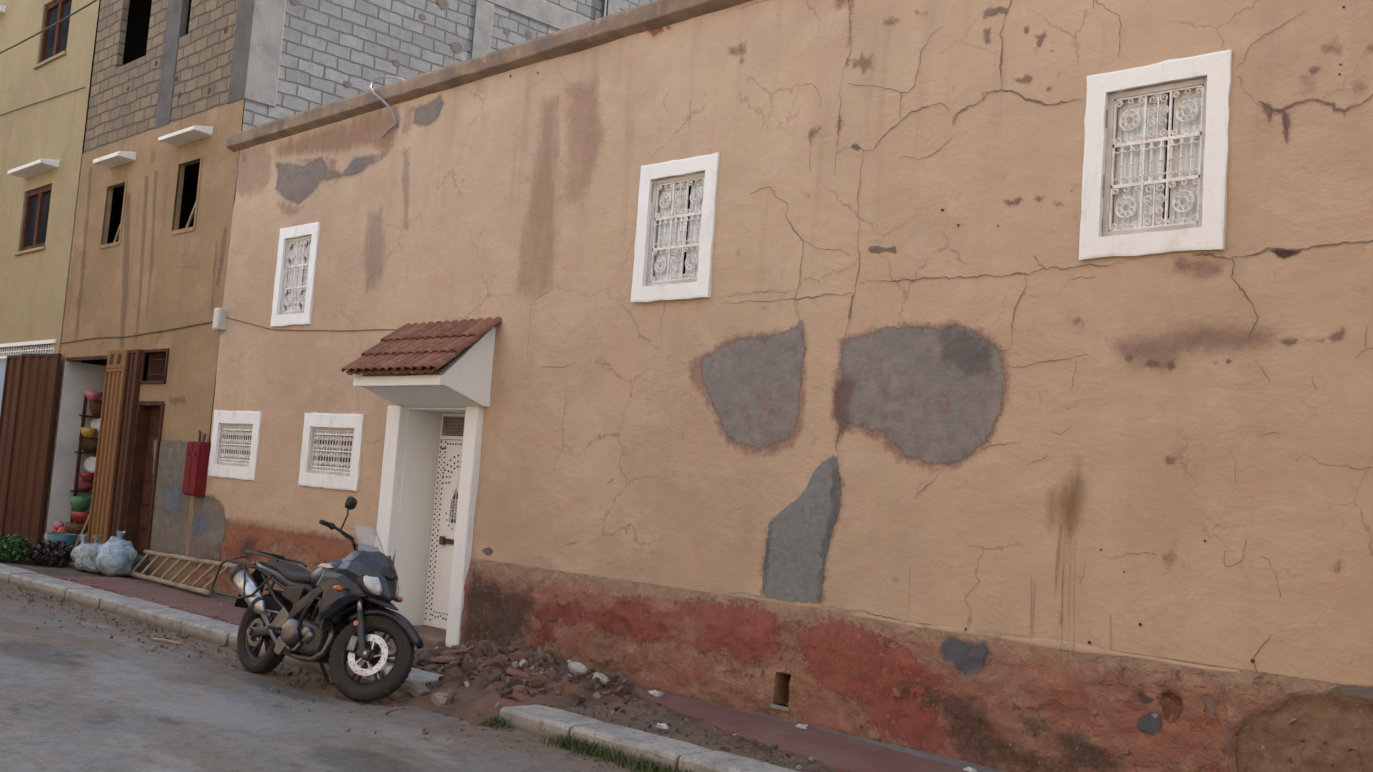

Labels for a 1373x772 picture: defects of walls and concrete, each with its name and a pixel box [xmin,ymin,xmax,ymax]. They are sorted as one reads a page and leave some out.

peeling [413,96,443,125]
crack [805,1,1082,214]
crack [1237,12,1373,143]
peeling [276,152,385,204]
crack [722,187,1113,389]
crack [1193,240,1373,337]
damp [464,575,529,646]
damp [1026,722,1118,769]
spalling [1203,685,1373,772]